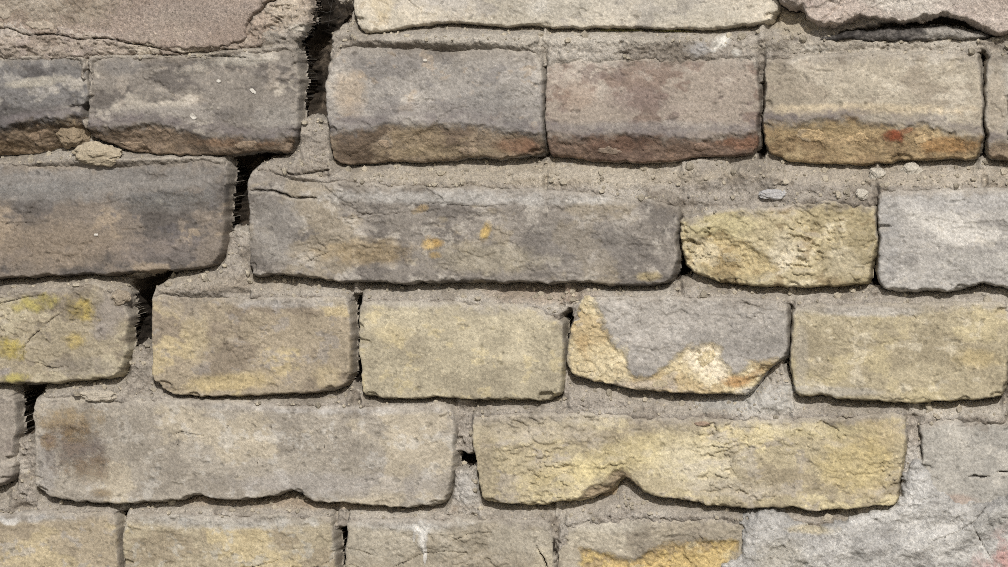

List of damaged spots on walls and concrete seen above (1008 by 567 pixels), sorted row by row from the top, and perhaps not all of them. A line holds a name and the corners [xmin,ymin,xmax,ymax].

crack [21,33,229,57]
crack [306,0,354,116]
spalling [0,117,296,156]
spalling [329,117,1008,166]
crack [232,153,328,226]
spalling [758,189,787,200]
spalling [693,232,778,280]
crack [133,271,179,344]
spalling [568,295,781,395]
crack [22,366,60,436]
spalling [579,471,635,500]